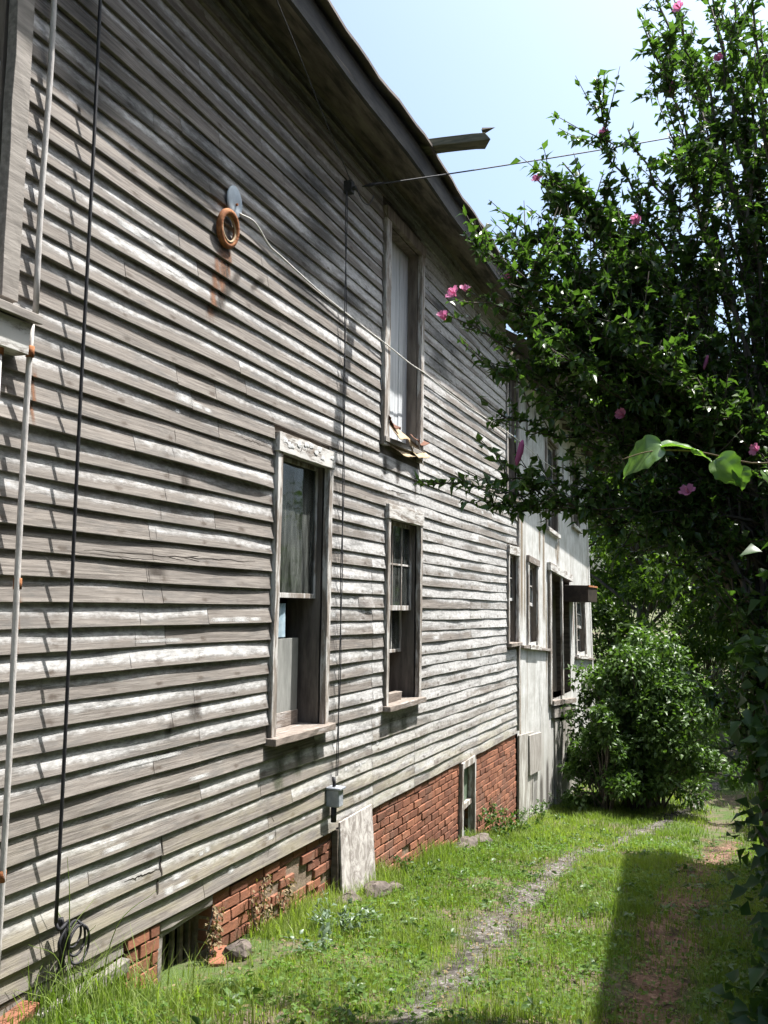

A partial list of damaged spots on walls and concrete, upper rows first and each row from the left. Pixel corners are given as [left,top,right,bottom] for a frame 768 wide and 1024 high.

rust [209,208,240,310]
crack [125,836,164,894]